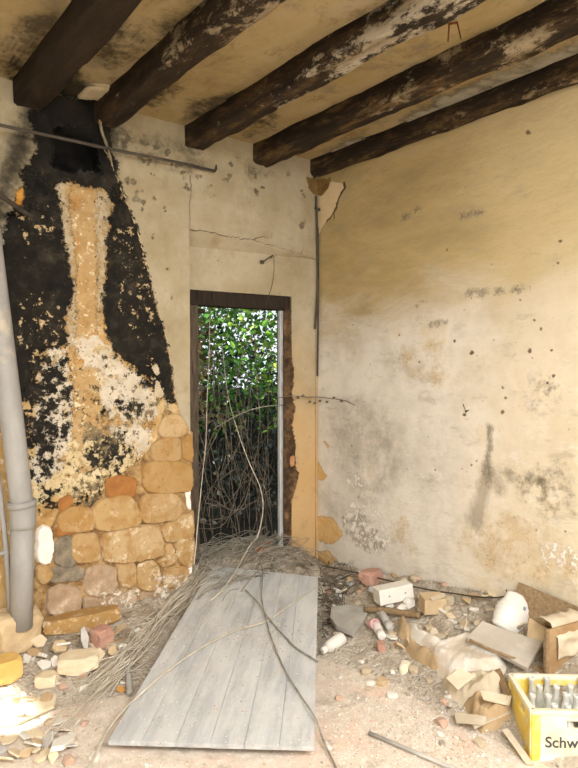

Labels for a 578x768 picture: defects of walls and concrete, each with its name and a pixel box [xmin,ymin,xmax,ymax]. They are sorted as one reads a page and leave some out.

leakage [0,14,59,72]
peeling [301,177,344,234]
leakage [0,73,176,404]
crack [190,229,311,257]
spalling [22,149,180,575]
spalling [283,305,299,538]
leakage [484,425,493,484]
spalling [0,432,10,609]
peeling [318,472,391,565]
leakage [343,513,384,550]
peeling [539,540,578,576]